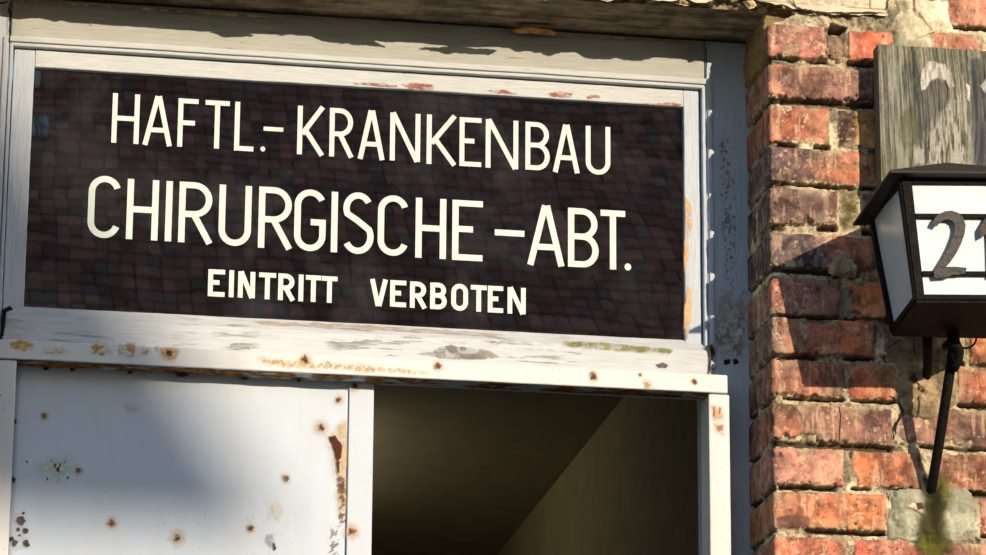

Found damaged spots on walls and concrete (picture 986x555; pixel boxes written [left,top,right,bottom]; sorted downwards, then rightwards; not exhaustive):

spalling [582,0,801,17]
rust [11,341,524,390]
peeling [258,321,497,359]
peeling [715,296,745,365]
rust [539,373,723,432]
rust [320,424,356,554]
damp [918,475,952,555]